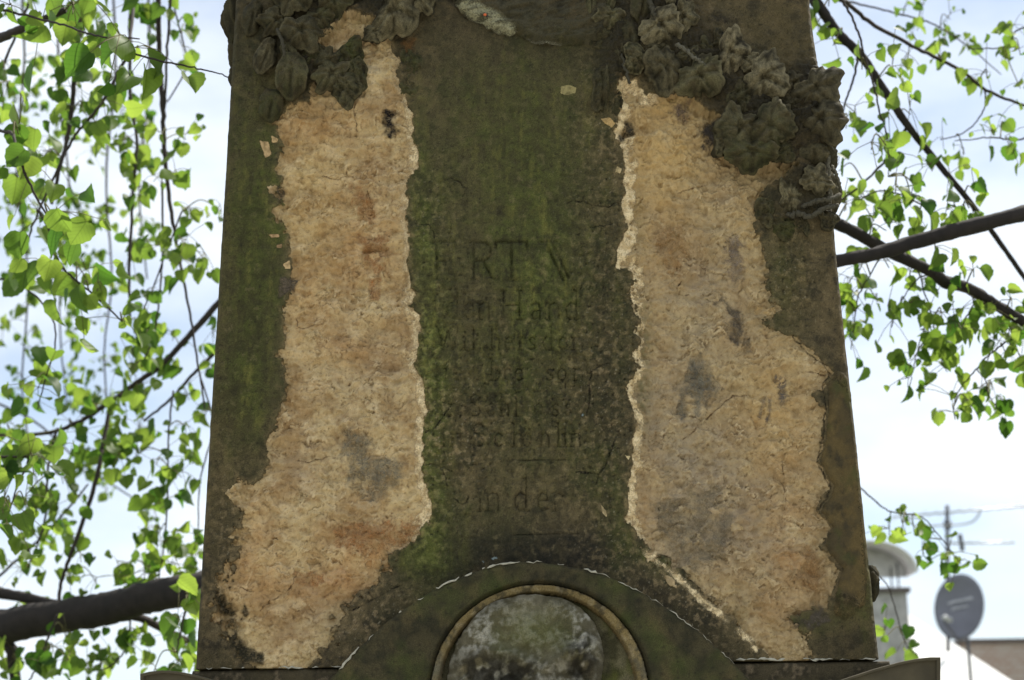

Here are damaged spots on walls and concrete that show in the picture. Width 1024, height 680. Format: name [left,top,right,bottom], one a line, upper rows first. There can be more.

spalling [207,10,432,668]
spalling [601,76,867,660]